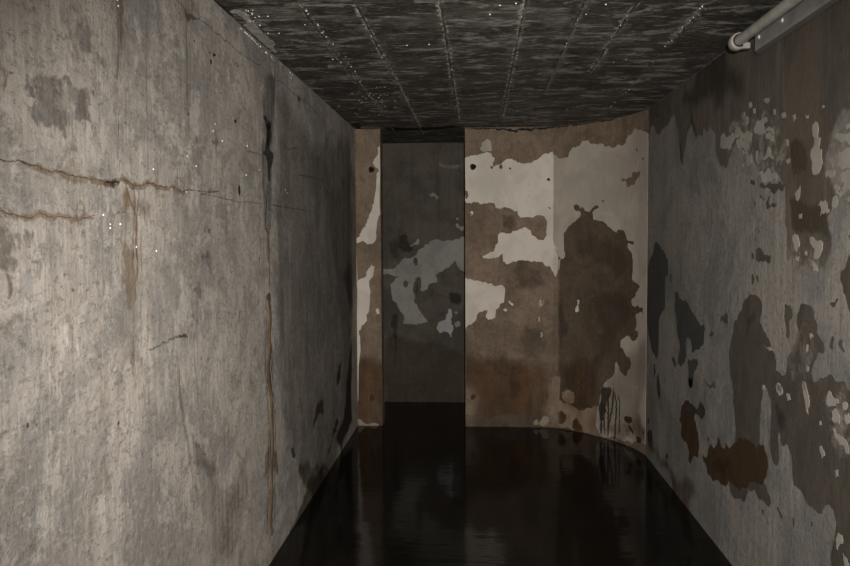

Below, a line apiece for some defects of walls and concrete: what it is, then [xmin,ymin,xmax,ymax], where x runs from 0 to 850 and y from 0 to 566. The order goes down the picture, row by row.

crack [0,210,124,222]
crack [0,159,306,211]
water stain [253,73,275,252]
peeling [356,146,380,244]
peeling [720,98,796,183]
peeling [806,115,850,216]
peeling [356,218,514,376]
peeling [465,129,648,444]
rust [265,292,277,535]
water stain [599,387,620,440]
rust [679,400,768,490]
peeling [826,391,850,454]